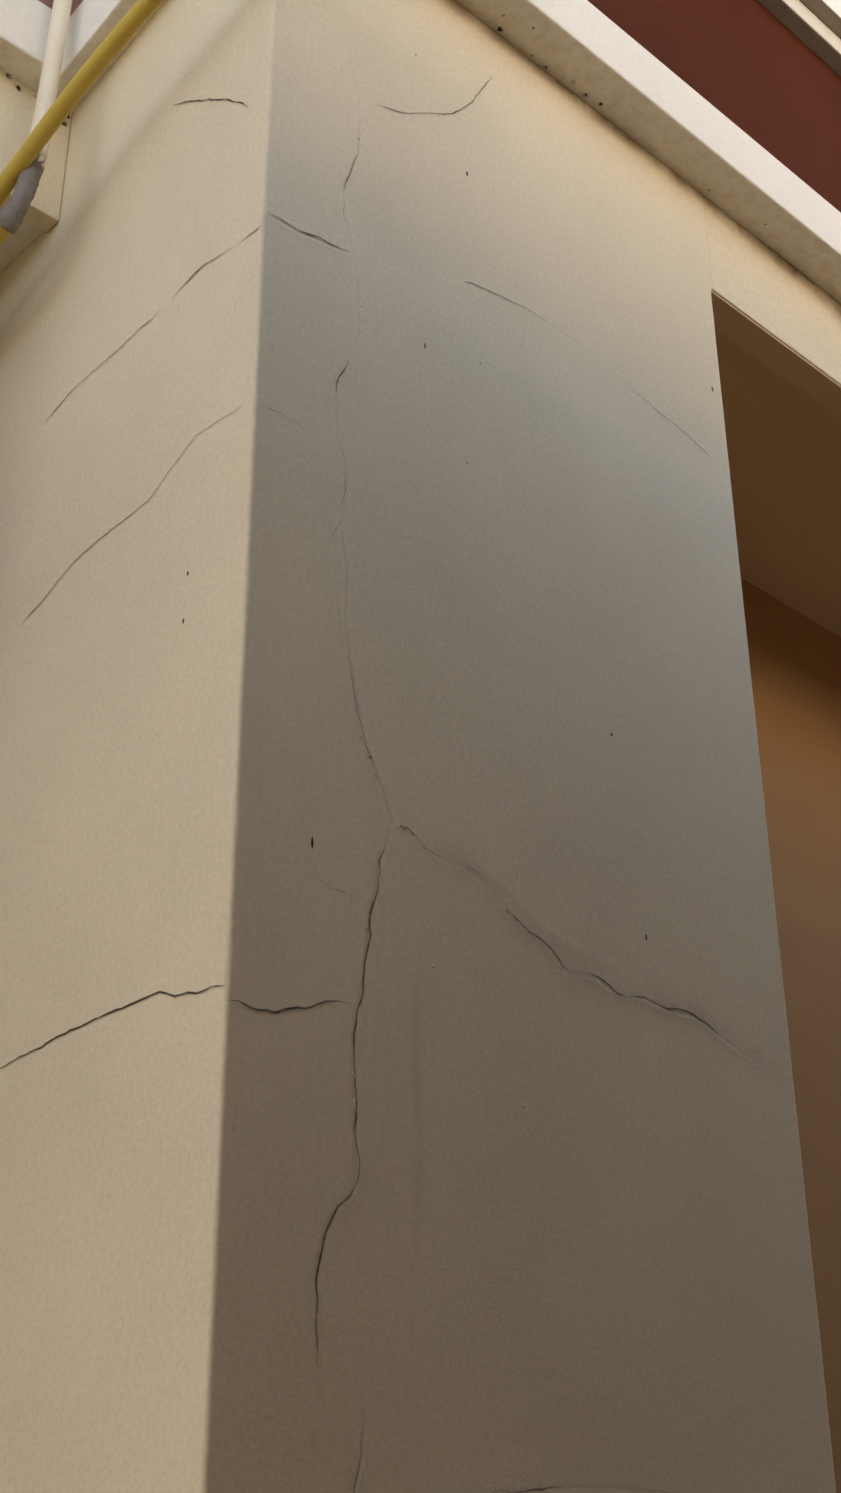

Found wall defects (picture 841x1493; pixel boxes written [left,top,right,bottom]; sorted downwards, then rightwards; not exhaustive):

crack [44,193,354,423]
crack [0,985,338,1069]